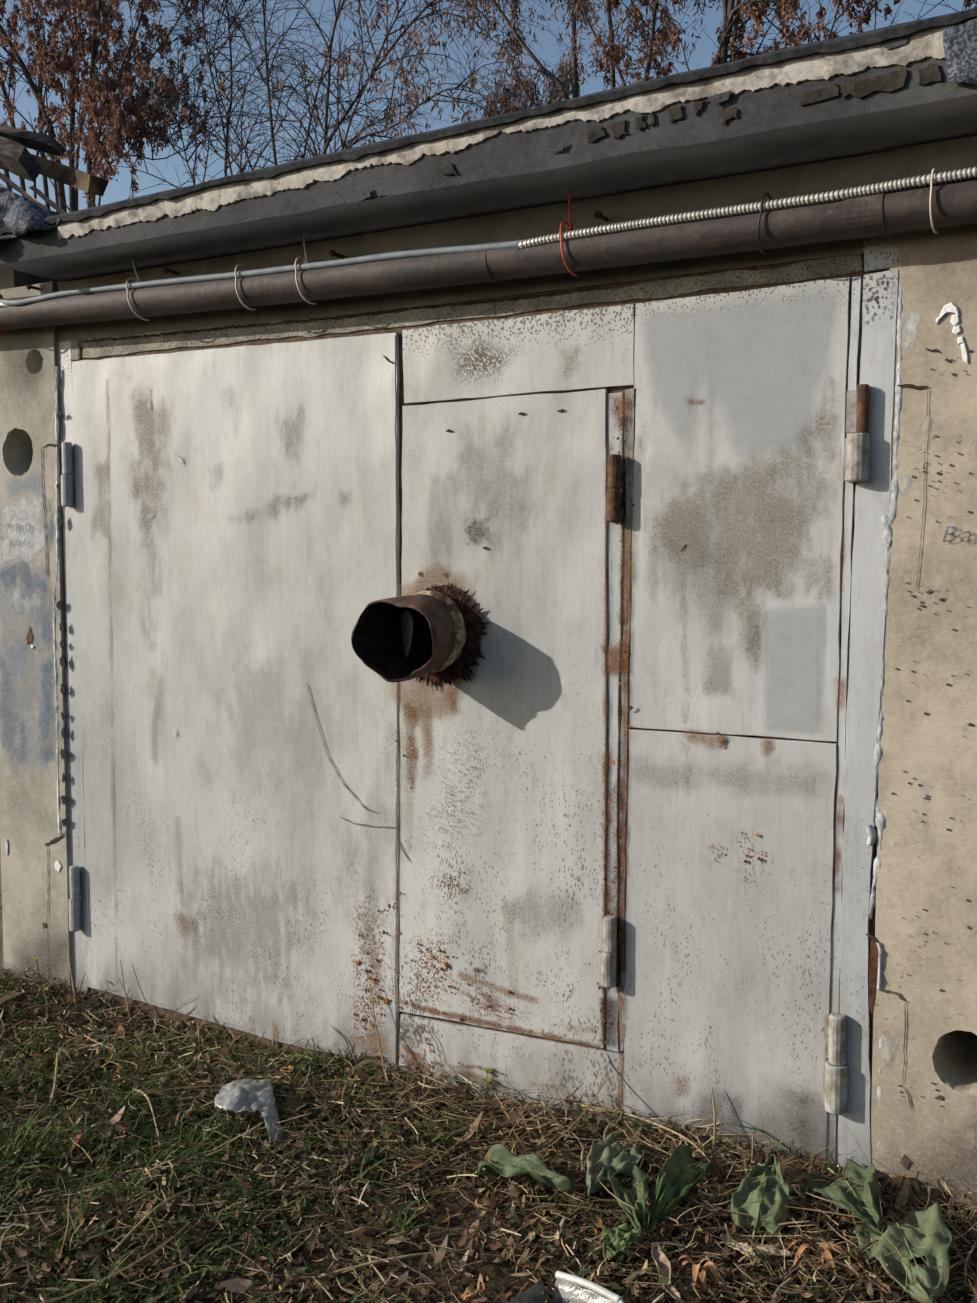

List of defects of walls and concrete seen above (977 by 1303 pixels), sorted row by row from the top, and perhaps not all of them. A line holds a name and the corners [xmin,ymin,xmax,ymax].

peeling [58,23,961,240]
corrosion [353,396,635,1088]
crack [879,989,912,1110]